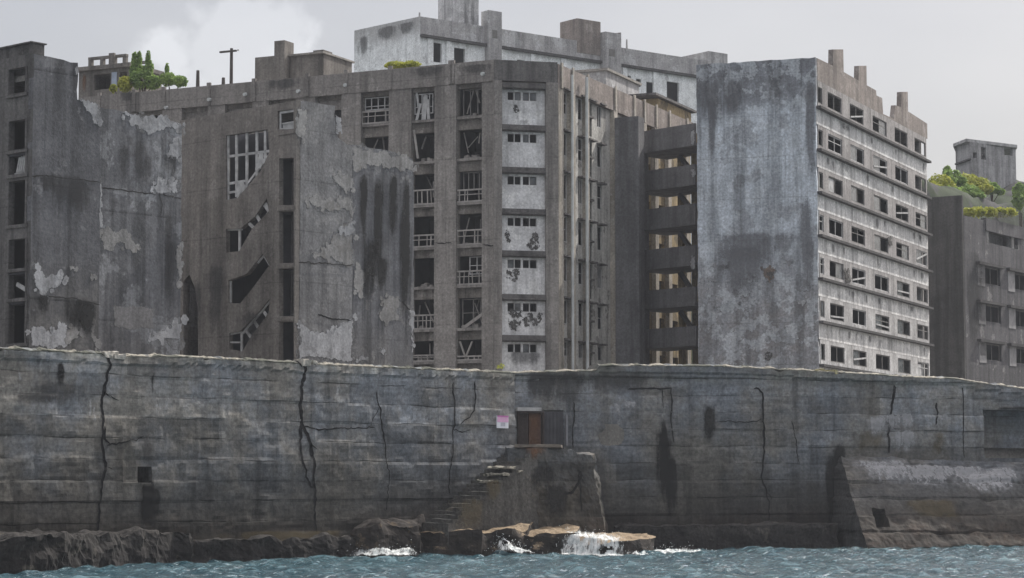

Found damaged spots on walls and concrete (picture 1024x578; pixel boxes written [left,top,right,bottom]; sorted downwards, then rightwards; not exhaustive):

peeling [121,111,185,164]
peeling [33,262,97,302]
peeling [296,313,358,363]
peeling [305,145,417,299]
leakage [360,175,410,309]
crack [96,358,143,531]
crack [296,361,390,535]
crack [448,382,476,494]
leakage [656,421,677,512]
leakage [705,408,715,440]
crack [719,387,792,522]
leakage [825,445,845,523]